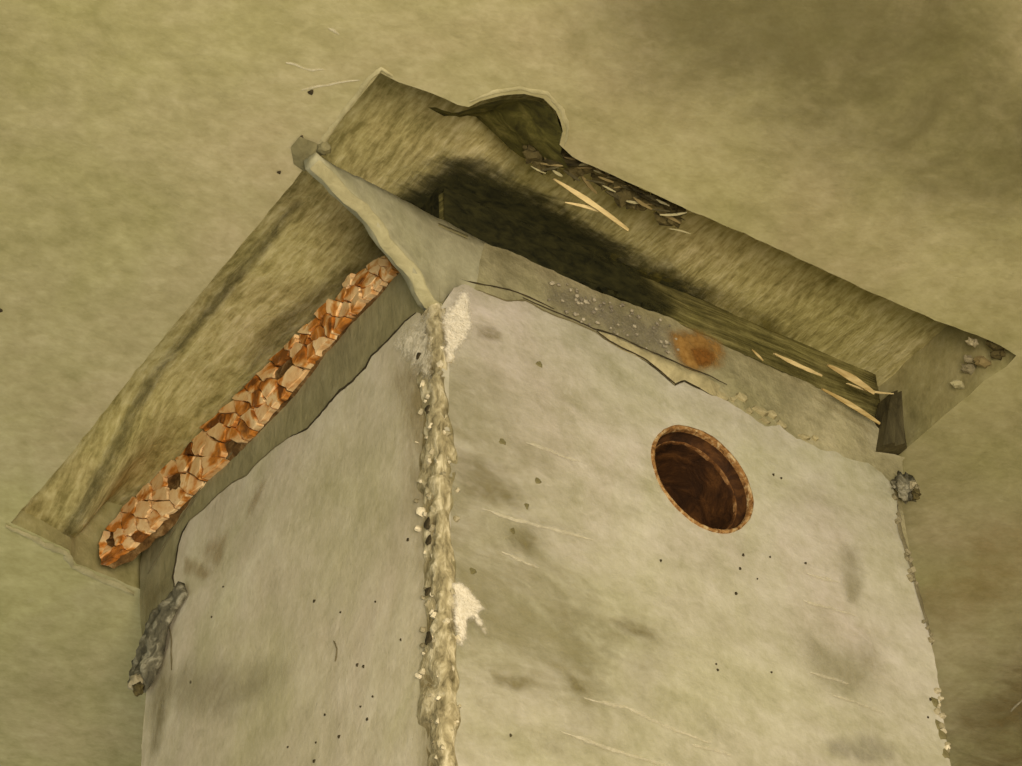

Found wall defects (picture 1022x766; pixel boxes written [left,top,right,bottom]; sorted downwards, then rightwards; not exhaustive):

spalling [428,86,690,234]
leakage [399,159,702,316]
peeling [547,281,787,430]
corrosion [671,332,723,370]
spalling [99,160,462,766]